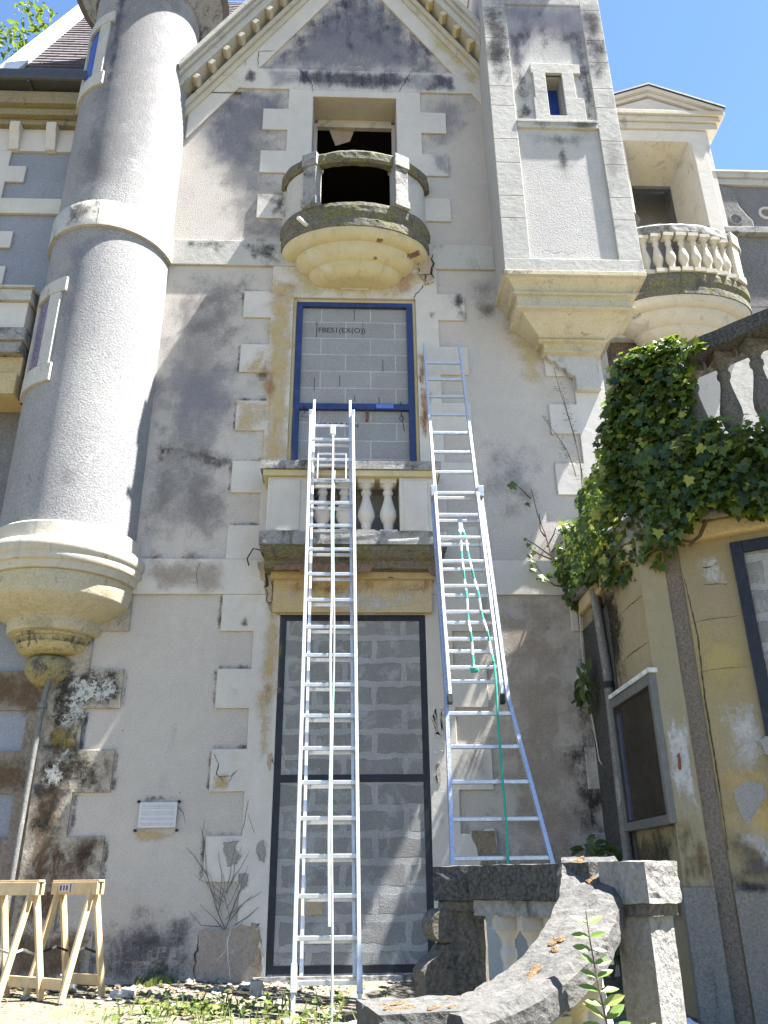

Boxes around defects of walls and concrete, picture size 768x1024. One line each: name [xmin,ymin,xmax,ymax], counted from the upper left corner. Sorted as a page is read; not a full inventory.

damp [511,14,546,64]
crack [414,254,435,298]
damp [161,446,228,466]
crack [684,563,749,848]
damp [20,741,95,921]
damp [13,932,85,978]